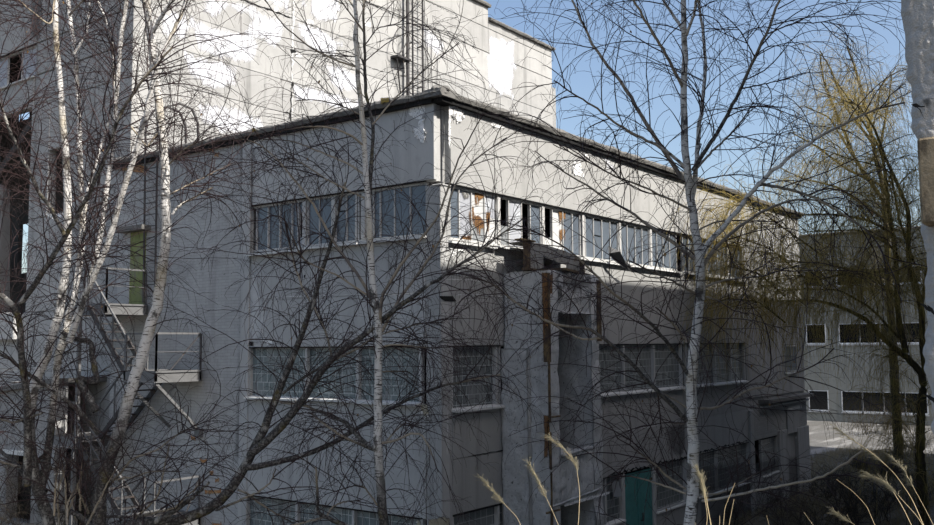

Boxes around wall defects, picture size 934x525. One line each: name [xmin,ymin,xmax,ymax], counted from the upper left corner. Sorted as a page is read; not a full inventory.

spalling [409,105,426,143]
rust [542,272,553,339]